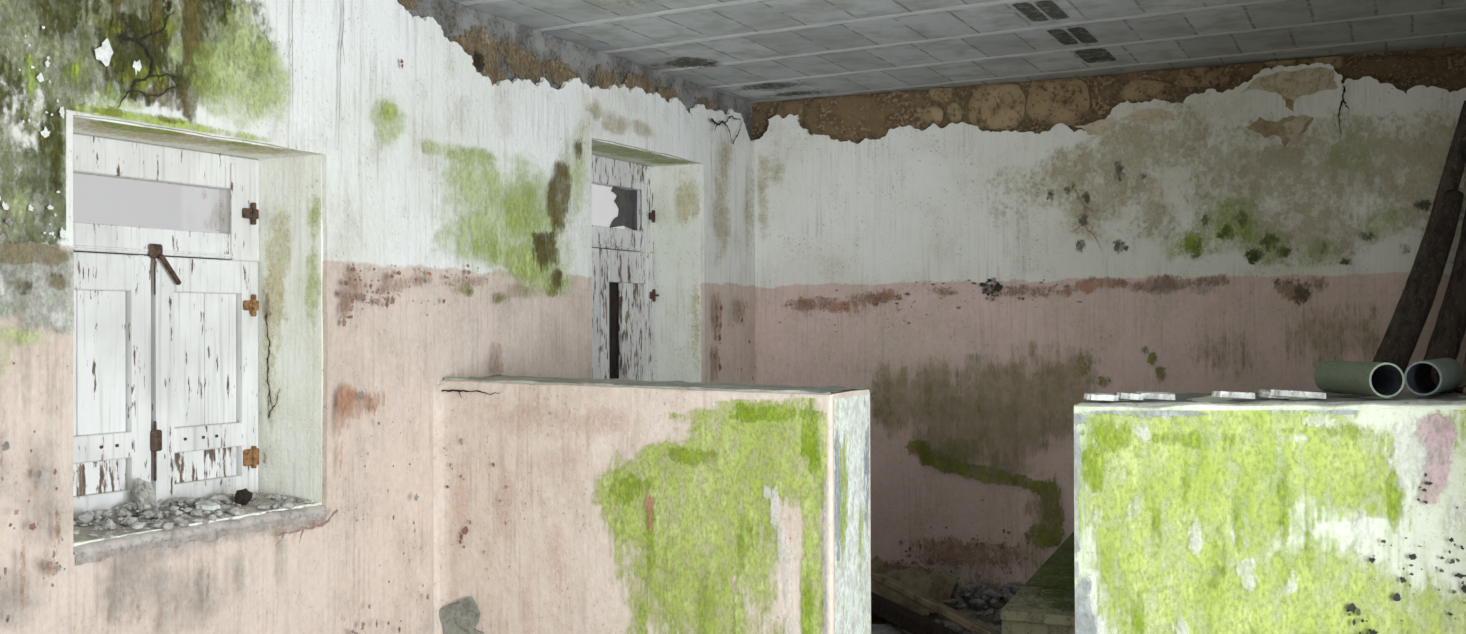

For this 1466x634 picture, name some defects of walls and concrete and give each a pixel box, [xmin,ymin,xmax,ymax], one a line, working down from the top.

peeling [397,0,1466,146]
leakage [1026,112,1455,261]
peeling [779,277,1082,332]
leakage [823,346,1209,634]
leakage [615,501,624,578]
leakage [637,604,647,634]
leakage [764,485,793,599]
leakage [1346,603,1378,634]
leakage [1369,537,1466,619]